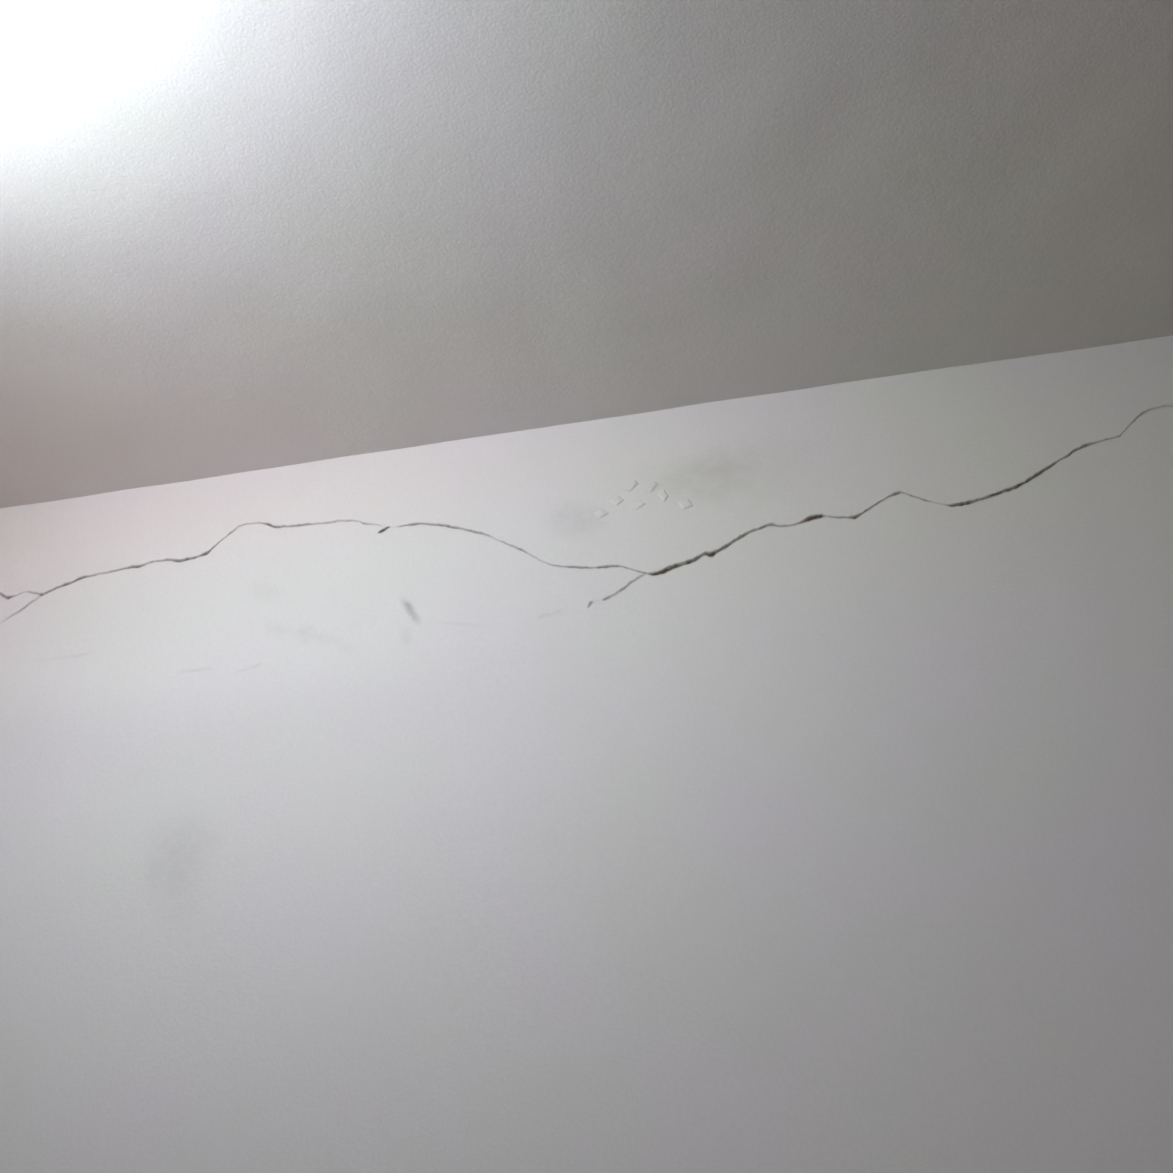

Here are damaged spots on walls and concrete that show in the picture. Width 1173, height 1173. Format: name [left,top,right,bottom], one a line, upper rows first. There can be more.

crack [951,445,1088,507]
crack [651,526,766,575]